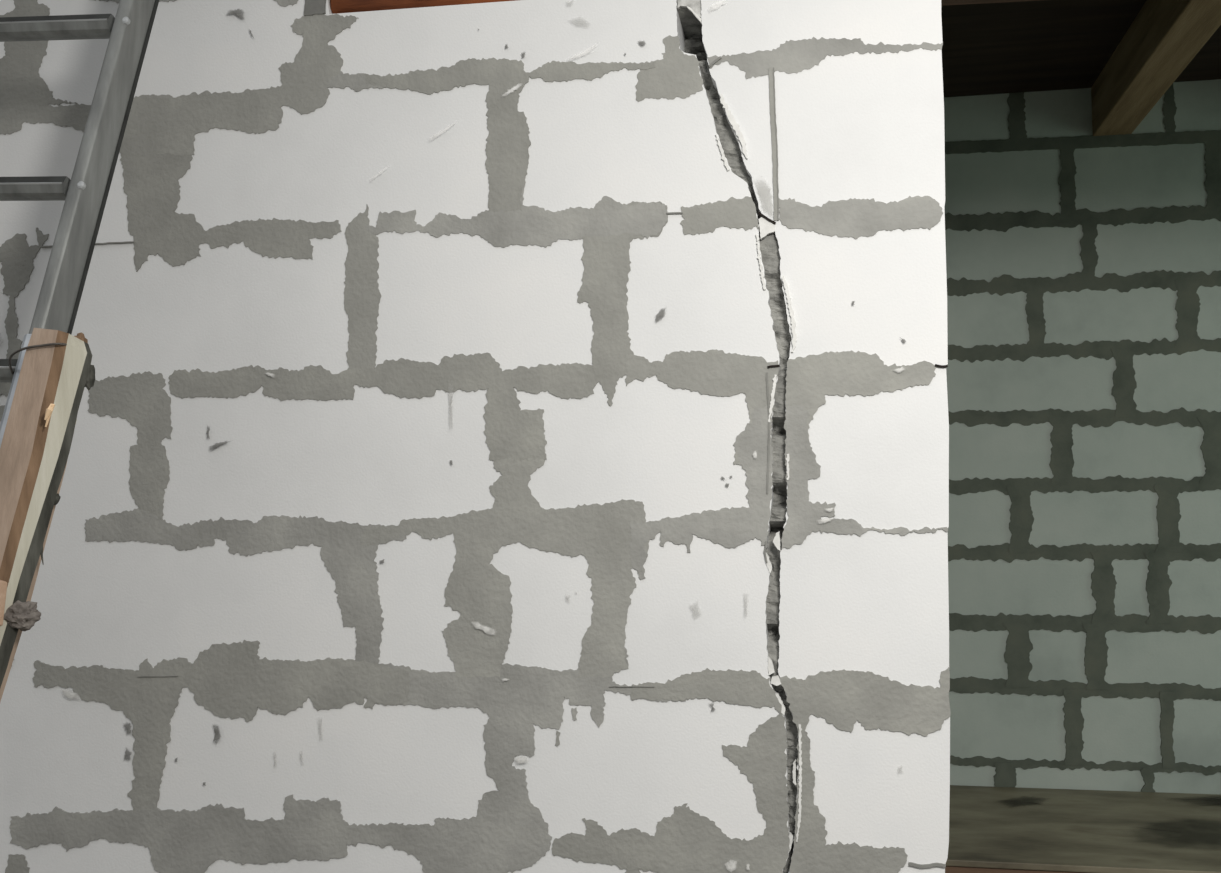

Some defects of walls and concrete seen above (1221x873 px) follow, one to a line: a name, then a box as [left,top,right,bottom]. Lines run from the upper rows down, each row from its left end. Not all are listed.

crack [677,0,802,873]